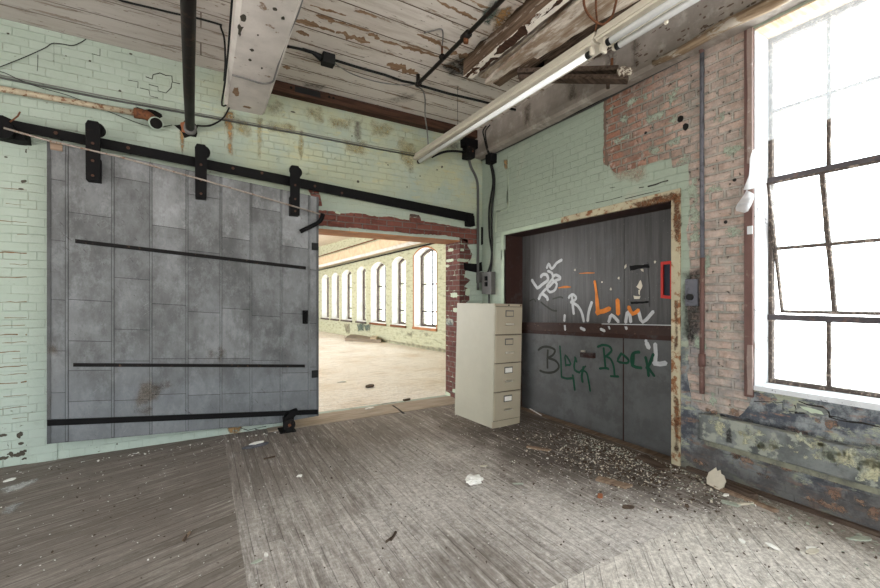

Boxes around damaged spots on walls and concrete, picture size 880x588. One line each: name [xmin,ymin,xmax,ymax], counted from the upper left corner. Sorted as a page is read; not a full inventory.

peeling [296,5,528,78]
peeling [437,0,477,21]
rust [634,192,682,241]
peeling [603,31,755,436]
peeling [308,190,477,398]
peeling [0,431,27,460]
peeling [730,403,880,482]
peeling [480,423,780,552]